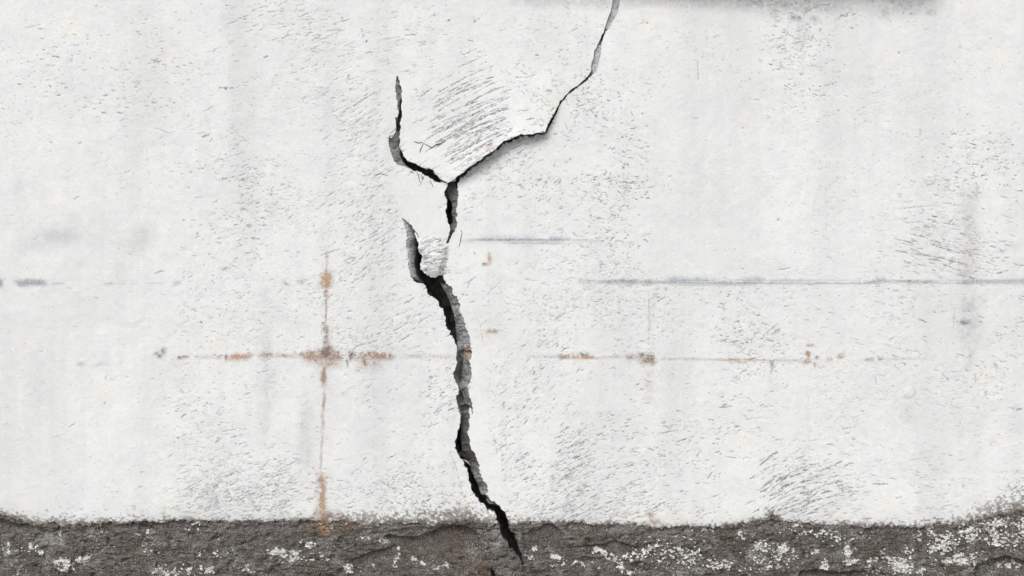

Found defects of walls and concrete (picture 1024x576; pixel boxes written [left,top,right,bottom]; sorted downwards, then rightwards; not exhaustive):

crack [375,0,620,245]
corrosion [314,475,343,534]
corrosion [303,327,391,383]
crack [402,217,524,564]